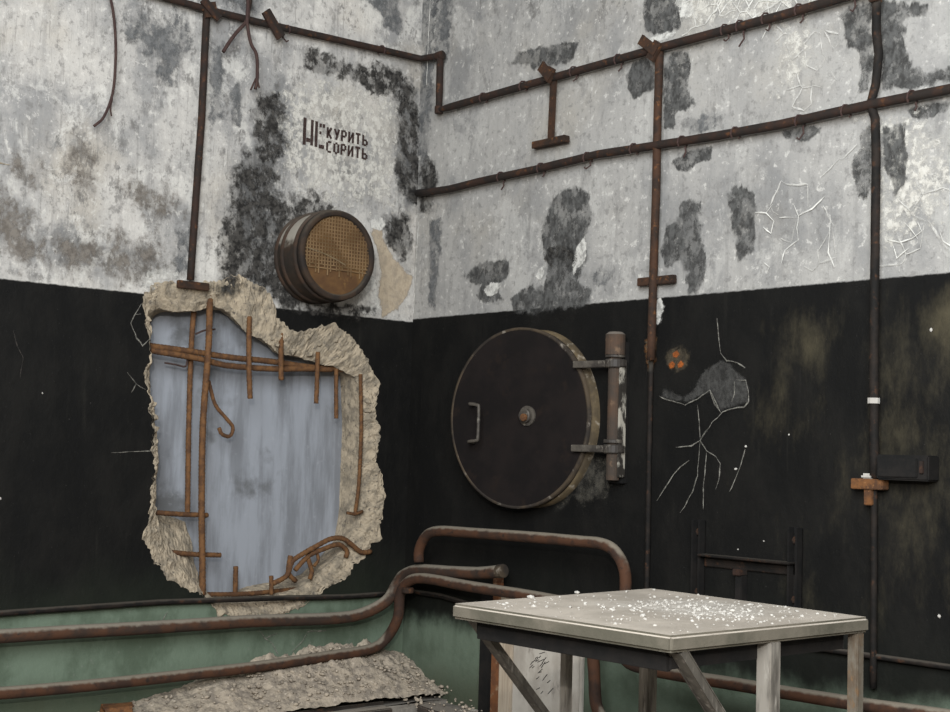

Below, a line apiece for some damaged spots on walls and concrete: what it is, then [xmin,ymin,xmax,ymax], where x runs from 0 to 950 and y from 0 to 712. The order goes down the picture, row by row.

damp [208,45,287,150]
crack [682,0,844,111]
damp [843,0,950,92]
damp [908,103,948,119]
damp [852,127,871,200]
damp [883,123,908,194]
damp [467,187,607,314]
damp [661,201,706,293]
crack [887,181,950,271]
damp [264,275,375,319]
spalling [142,264,386,617]